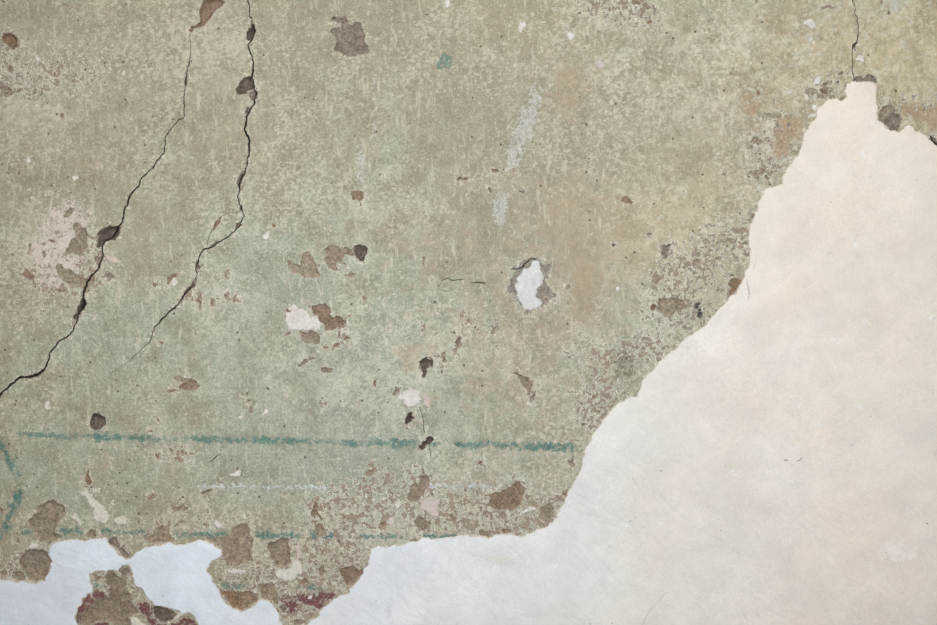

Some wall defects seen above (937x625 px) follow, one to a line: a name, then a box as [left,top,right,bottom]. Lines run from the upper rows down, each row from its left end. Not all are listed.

spalling [329,15,371,57]
peeling [878,103,901,131]
crack [0,33,191,397]
crack [109,0,258,374]
peeling [21,199,125,294]
peeling [286,244,368,278]
peeling [506,257,571,315]
peeling [284,303,353,352]
spalling [0,499,67,583]
peeling [200,508,254,567]
peeling [478,480,526,537]
peeling [221,583,292,613]